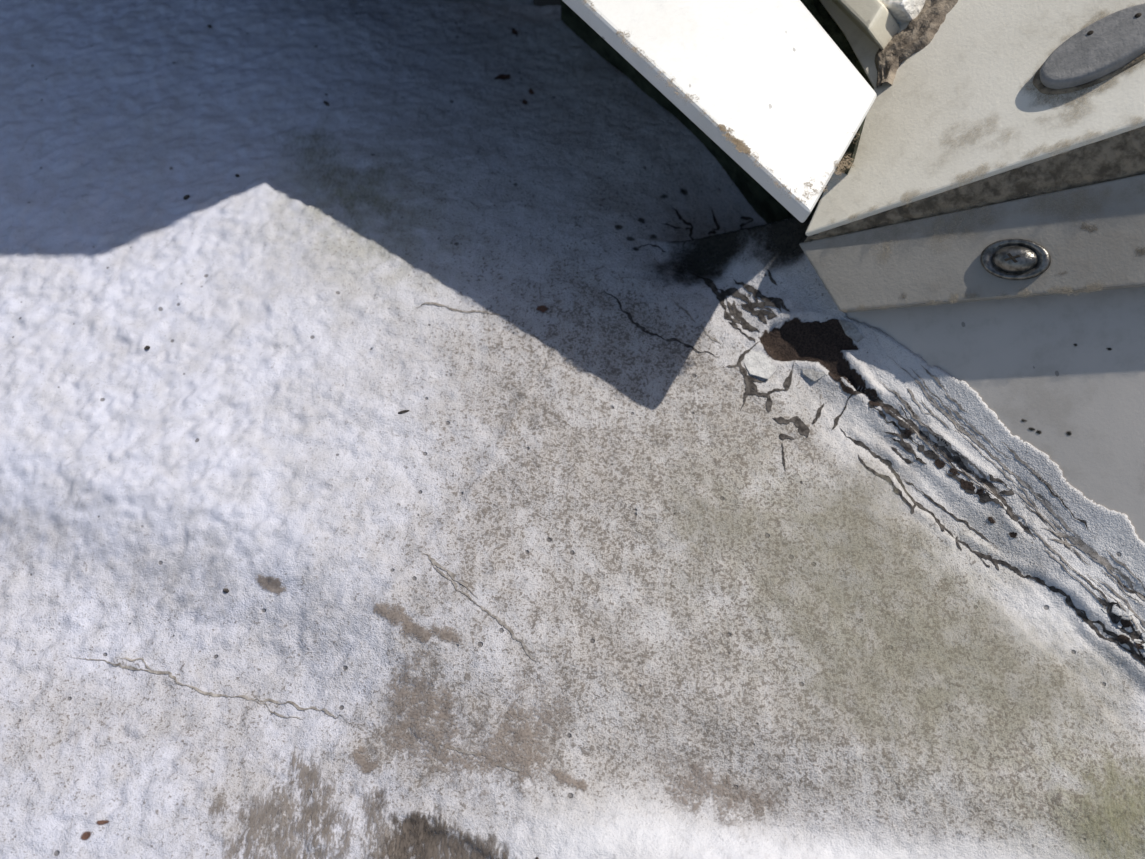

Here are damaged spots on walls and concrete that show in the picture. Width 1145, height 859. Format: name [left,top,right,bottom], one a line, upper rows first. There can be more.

peeling [743,318,889,410]
crack [597,268,1145,665]
peeling [1097,597,1145,651]
crack [72,657,356,727]
leakage [290,752,334,859]
leakage [362,790,397,859]